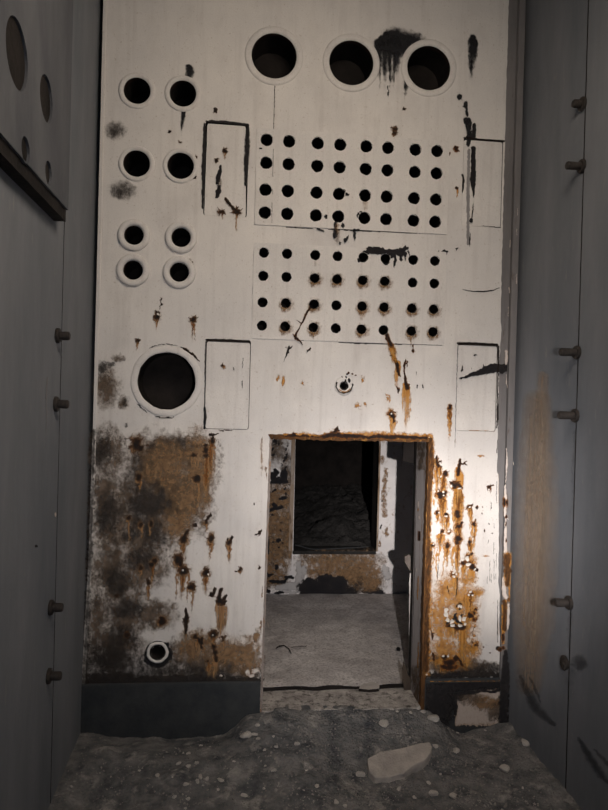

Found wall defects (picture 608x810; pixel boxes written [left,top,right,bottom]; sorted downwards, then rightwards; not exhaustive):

water stain [374,28,423,95]
water stain [468,34,478,75]
water stain [457,94,472,147]
crack [276,306,311,386]
corrosion [110,339,250,677]
peeling [269,439,288,548]
peeling [266,561,385,594]
corrosion [255,394,483,682]